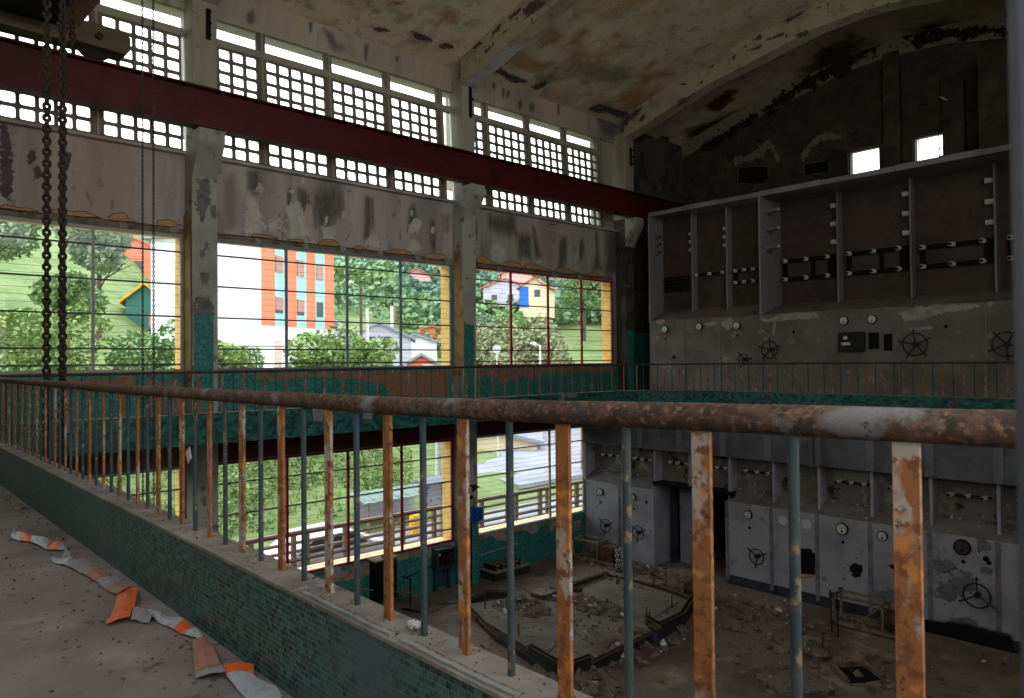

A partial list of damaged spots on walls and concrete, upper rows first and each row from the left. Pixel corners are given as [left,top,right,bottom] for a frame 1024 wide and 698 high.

peeling [732,11,811,60]
peeling [902,21,1008,50]
peeling [699,45,880,151]
peeling [0,123,137,222]
damp [287,189,339,221]
flaking render [157,178,217,383]
spalling [801,548,817,578]
spalling [849,563,863,578]